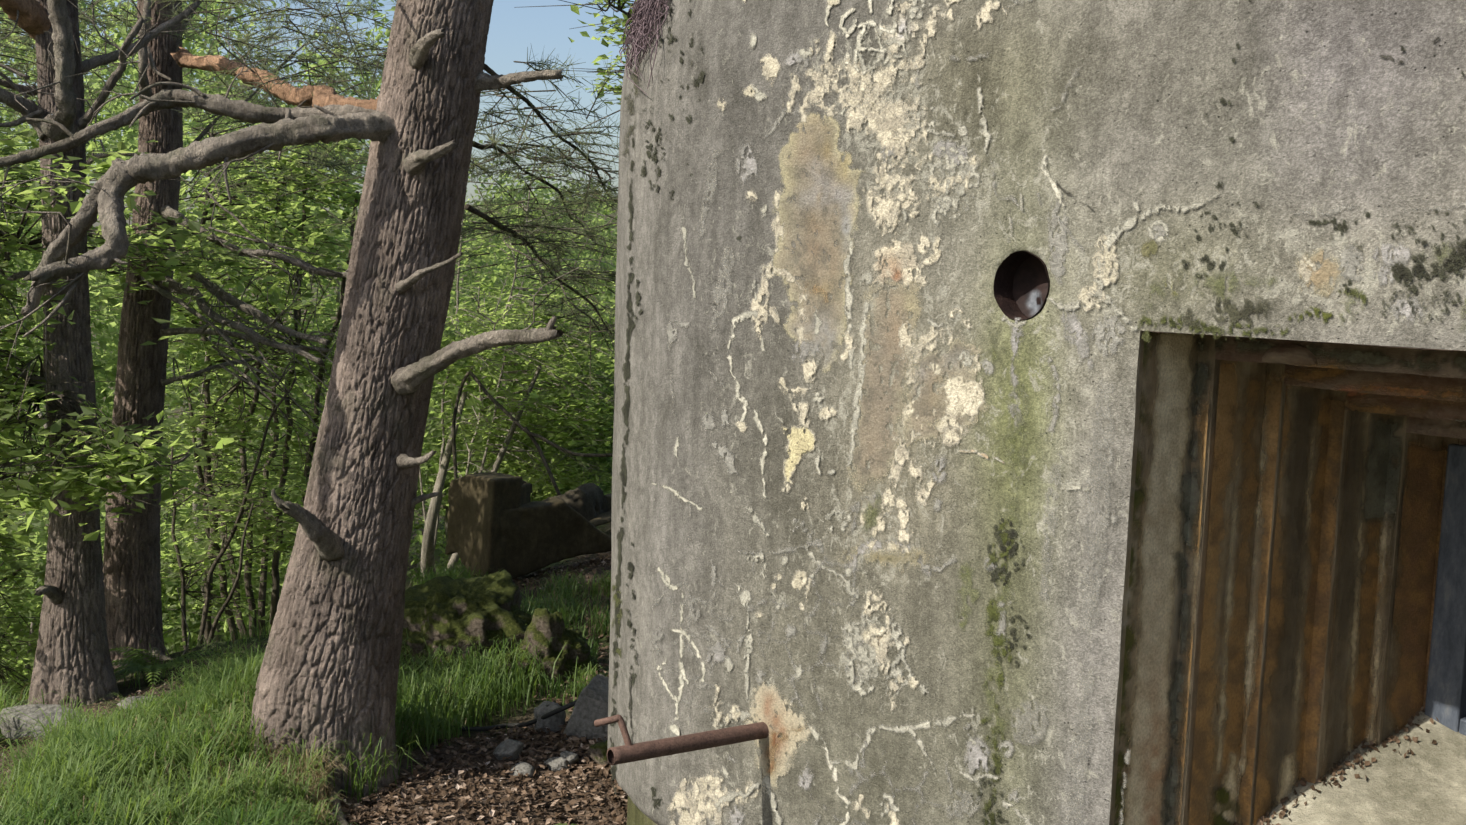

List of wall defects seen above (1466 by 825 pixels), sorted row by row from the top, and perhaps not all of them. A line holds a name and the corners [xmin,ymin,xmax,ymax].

leakage [736,144,767,216]
peeling [710,33,1005,710]
leakage [1048,199,1068,279]
leakage [1061,272,1466,372]
leakage [1339,243,1410,285]
leakage [703,410,737,474]
leakage [958,317,1031,825]
spalling [625,542,663,724]
peeling [690,609,733,729]
leakage [1105,448,1146,825]
peeling [651,769,744,825]
corrosion [720,683,810,825]